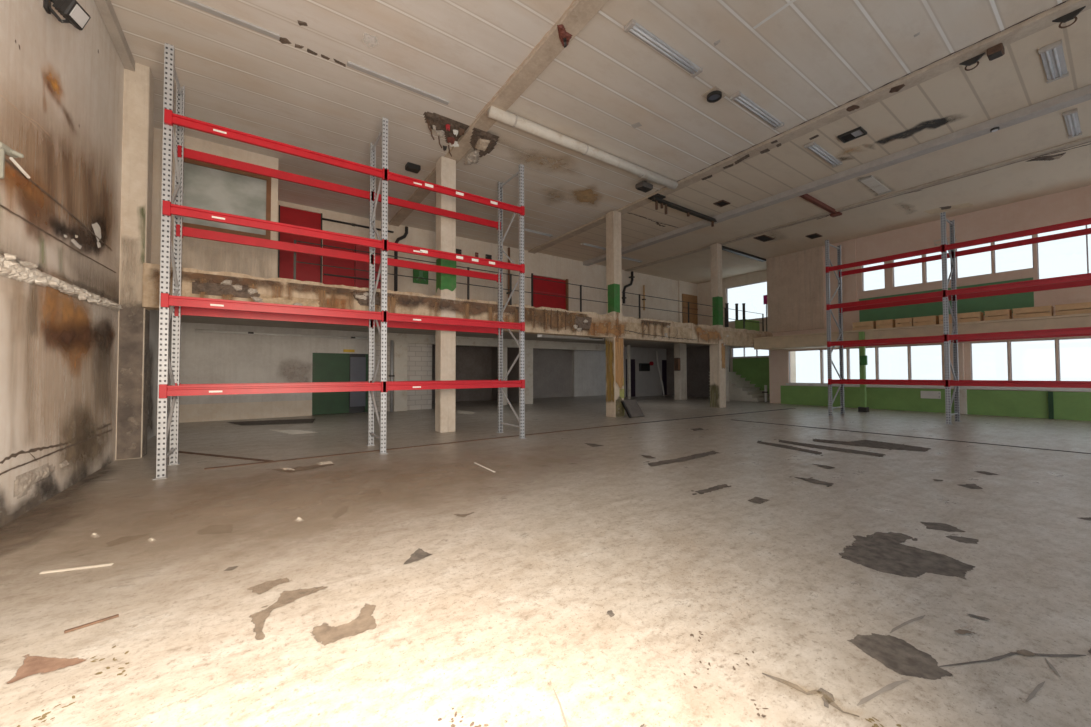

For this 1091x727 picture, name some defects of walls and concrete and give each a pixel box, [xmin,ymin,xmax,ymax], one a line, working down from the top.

leakage [7,126,112,237]
peeling [91,223,101,248]
spalling [0,253,122,311]
spalling [192,280,320,307]
spalling [353,292,381,306]
rust [30,286,114,401]
spalling [723,330,761,347]
leakage [0,208,153,555]
crack [762,673,859,717]